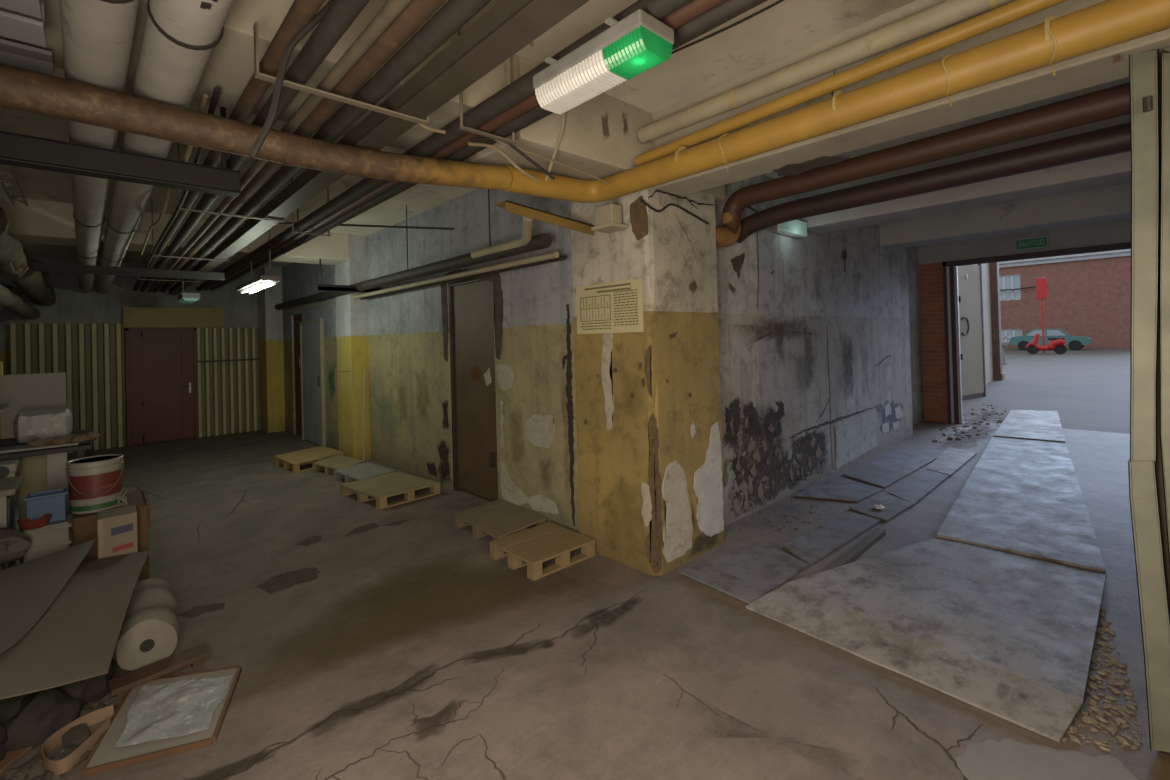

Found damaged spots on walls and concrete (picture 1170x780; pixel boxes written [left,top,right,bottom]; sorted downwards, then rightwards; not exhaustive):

spalling [642,345,652,398]
peeling [500,400,558,514]
peeling [641,414,825,574]
crack [217,589,645,780]
crack [663,674,719,716]
crack [876,687,984,780]